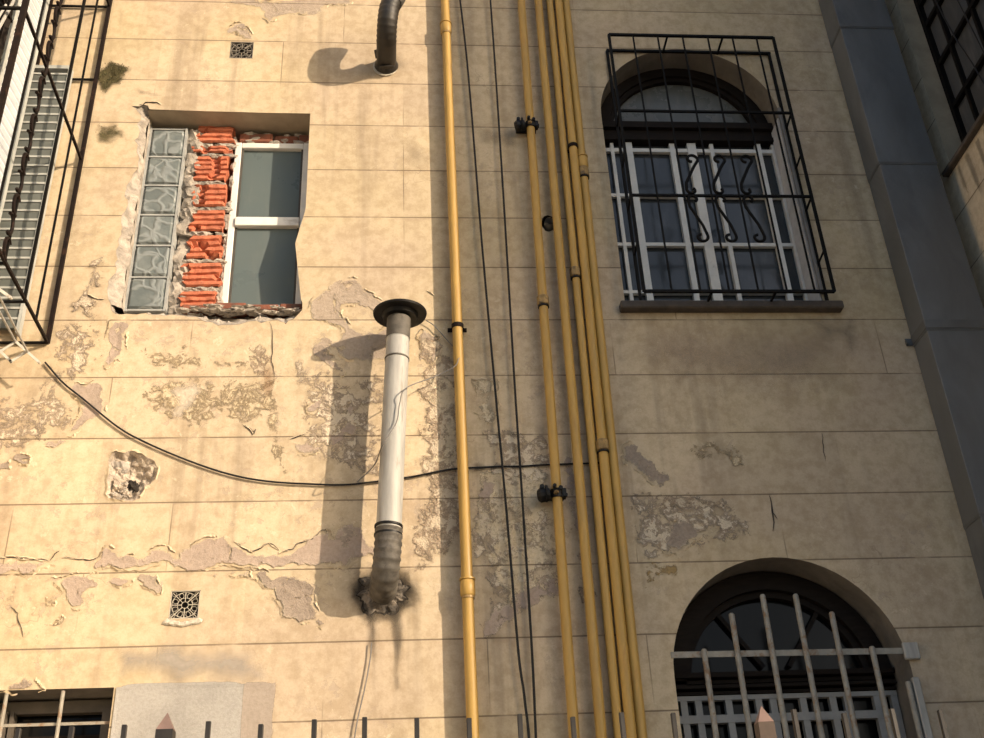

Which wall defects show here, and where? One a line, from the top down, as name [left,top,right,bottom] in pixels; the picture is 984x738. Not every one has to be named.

peeling [231,0,354,24]
peeling [0,257,129,474]
peeling [142,276,386,476]
spalling [103,449,160,502]
peeling [413,328,581,639]
peeling [620,440,749,558]
peeling [0,524,374,631]